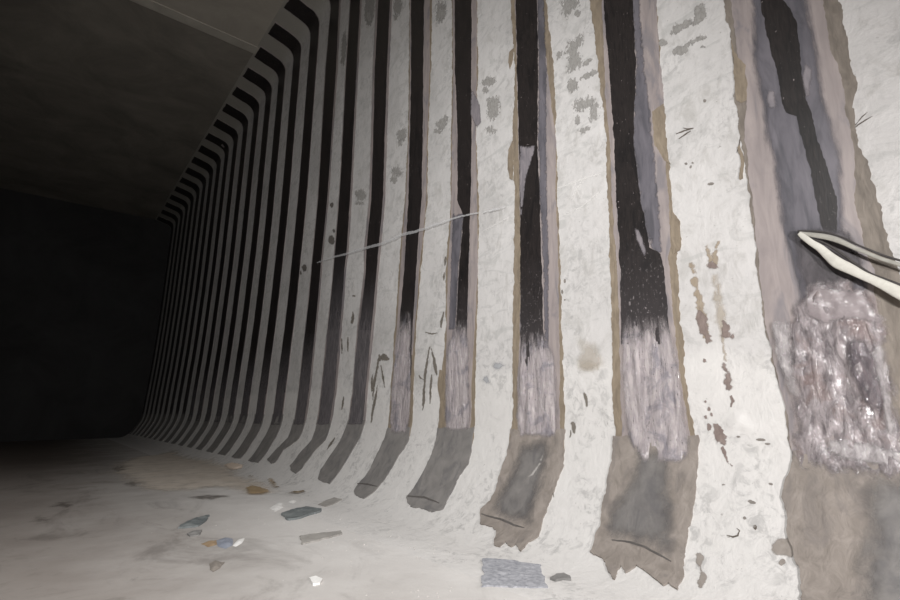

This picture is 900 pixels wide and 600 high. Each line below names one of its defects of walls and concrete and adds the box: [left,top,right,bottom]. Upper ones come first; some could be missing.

spalling [435,0,446,23]
spalling [659,3,707,55]
spalling [433,115,448,134]
spalling [482,75,501,134]
corrosion [689,241,735,407]
corrosion [704,400,733,466]